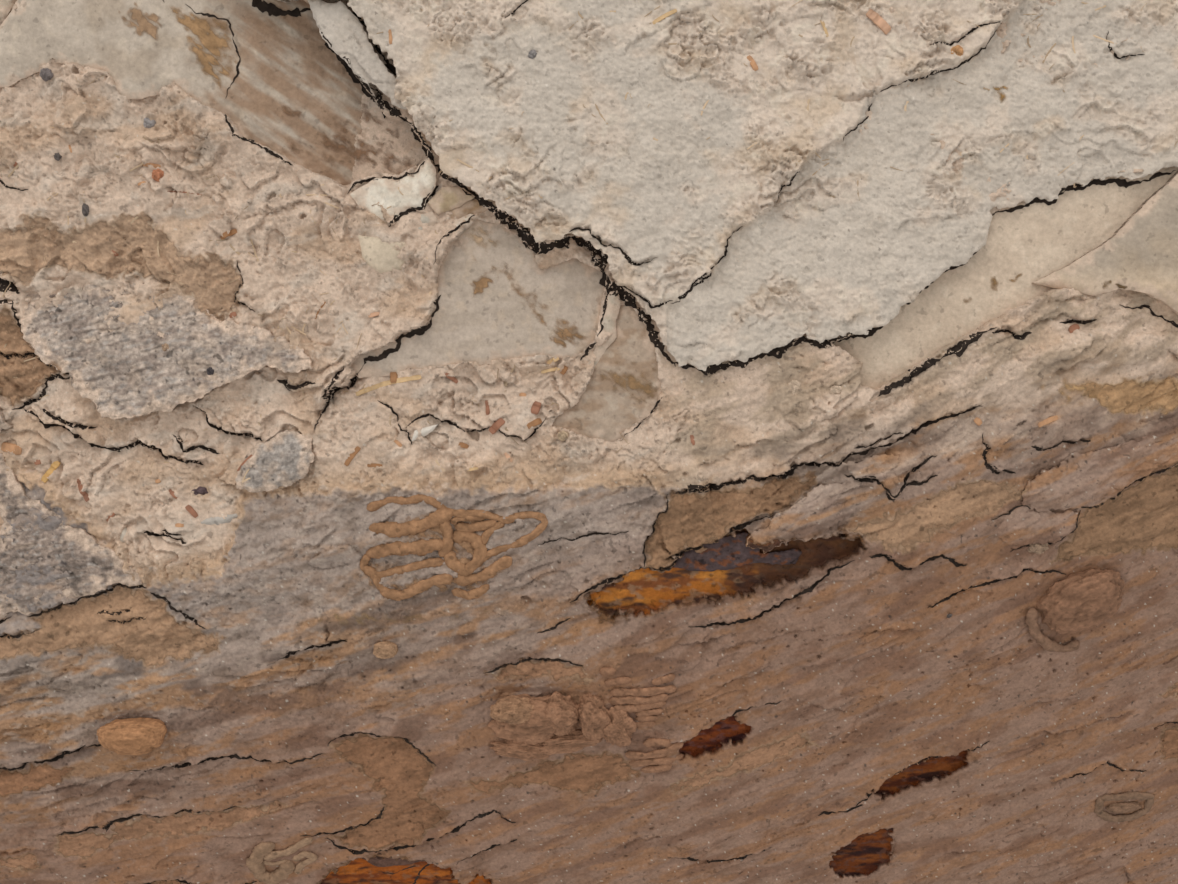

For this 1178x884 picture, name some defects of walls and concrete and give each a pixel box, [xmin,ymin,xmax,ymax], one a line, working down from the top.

crack [163,0,978,376]
flaking render [278,0,1178,371]
crack [992,170,1176,216]
peeling [0,212,313,419]
crack [277,295,441,430]
crack [879,327,1032,396]
spalling [0,453,224,666]
peeling [235,430,315,493]
crack [483,406,1015,674]
crack [690,464,1177,628]
hole [320,852,492,884]
hole [829,828,893,878]